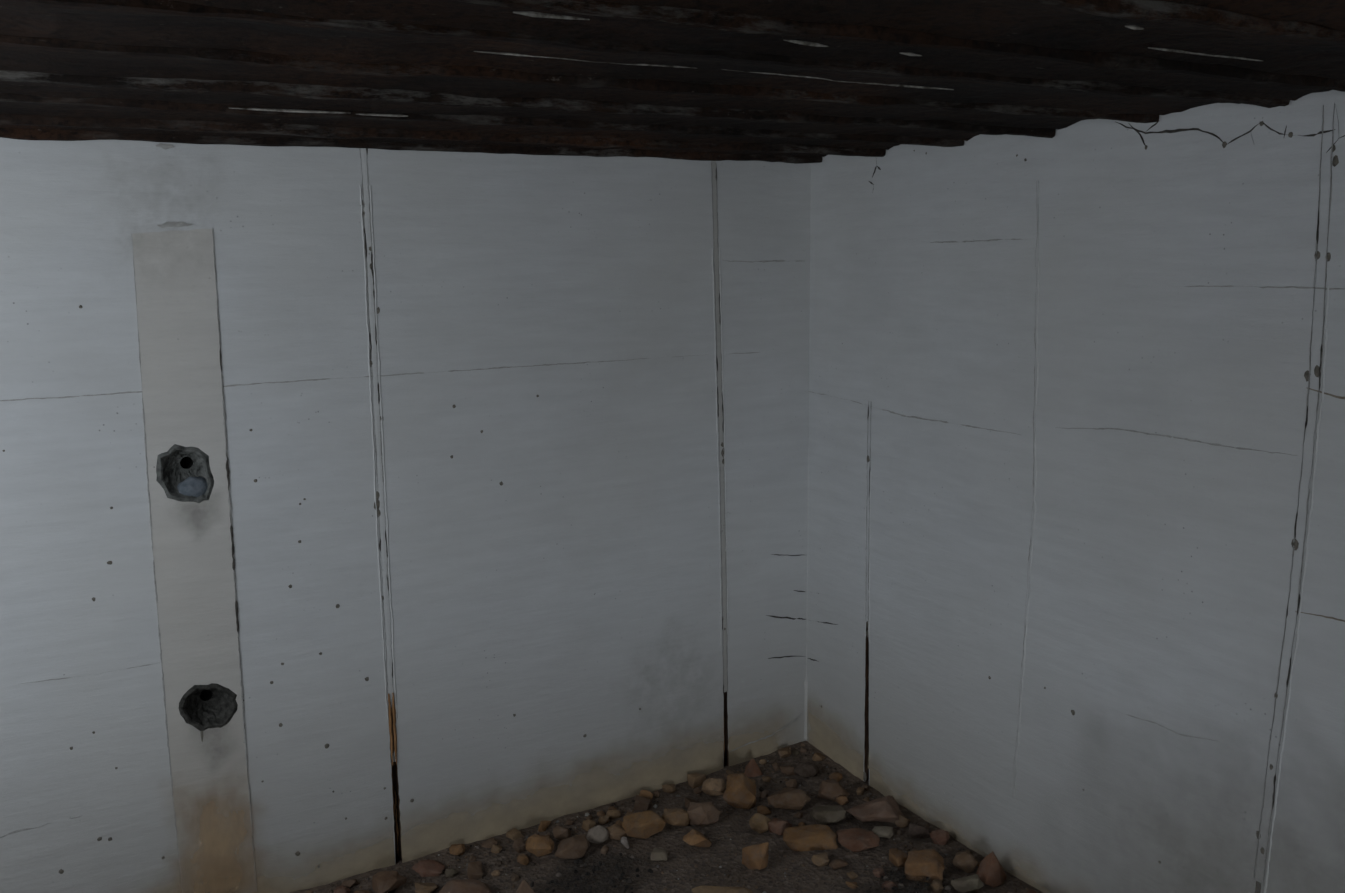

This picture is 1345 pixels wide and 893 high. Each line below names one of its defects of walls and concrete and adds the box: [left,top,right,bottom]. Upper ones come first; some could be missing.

crack [766,103,1345,893]